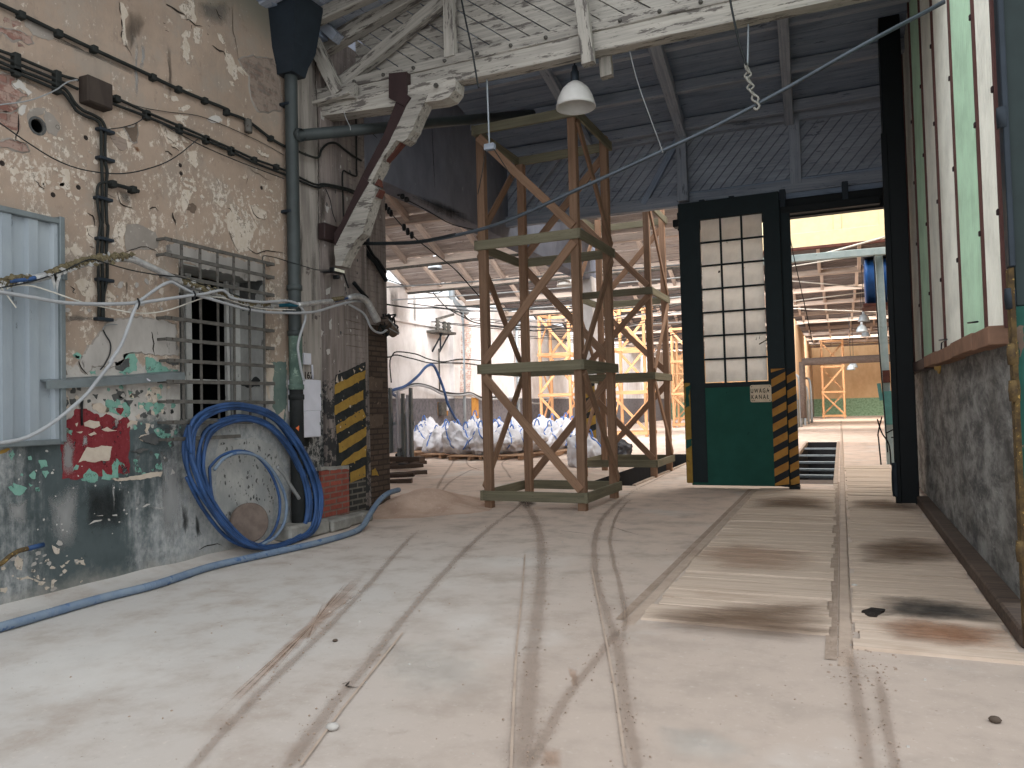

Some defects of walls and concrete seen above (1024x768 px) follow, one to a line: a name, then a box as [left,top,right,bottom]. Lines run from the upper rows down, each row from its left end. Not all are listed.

peeling [179,0,203,64]
flaking render [217,33,283,117]
flaking render [0,71,98,201]
flaking render [159,89,280,291]
flaking render [66,274,181,493]
leakage [64,437,87,467]
leakage [54,494,74,539]
leakage [91,489,120,521]
peeling [0,519,85,593]